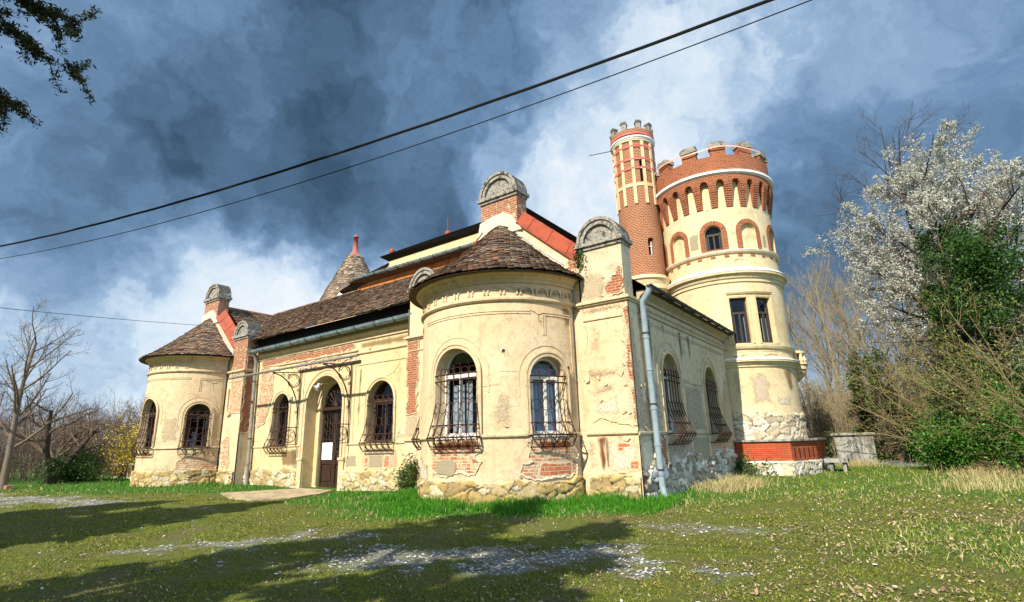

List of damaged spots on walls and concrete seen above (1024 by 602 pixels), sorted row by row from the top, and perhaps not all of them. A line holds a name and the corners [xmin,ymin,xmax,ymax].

spalling [146,343,355,472]
spalling [363,340,420,470]
spalling [420,439,482,481]
spalling [490,260,670,481]